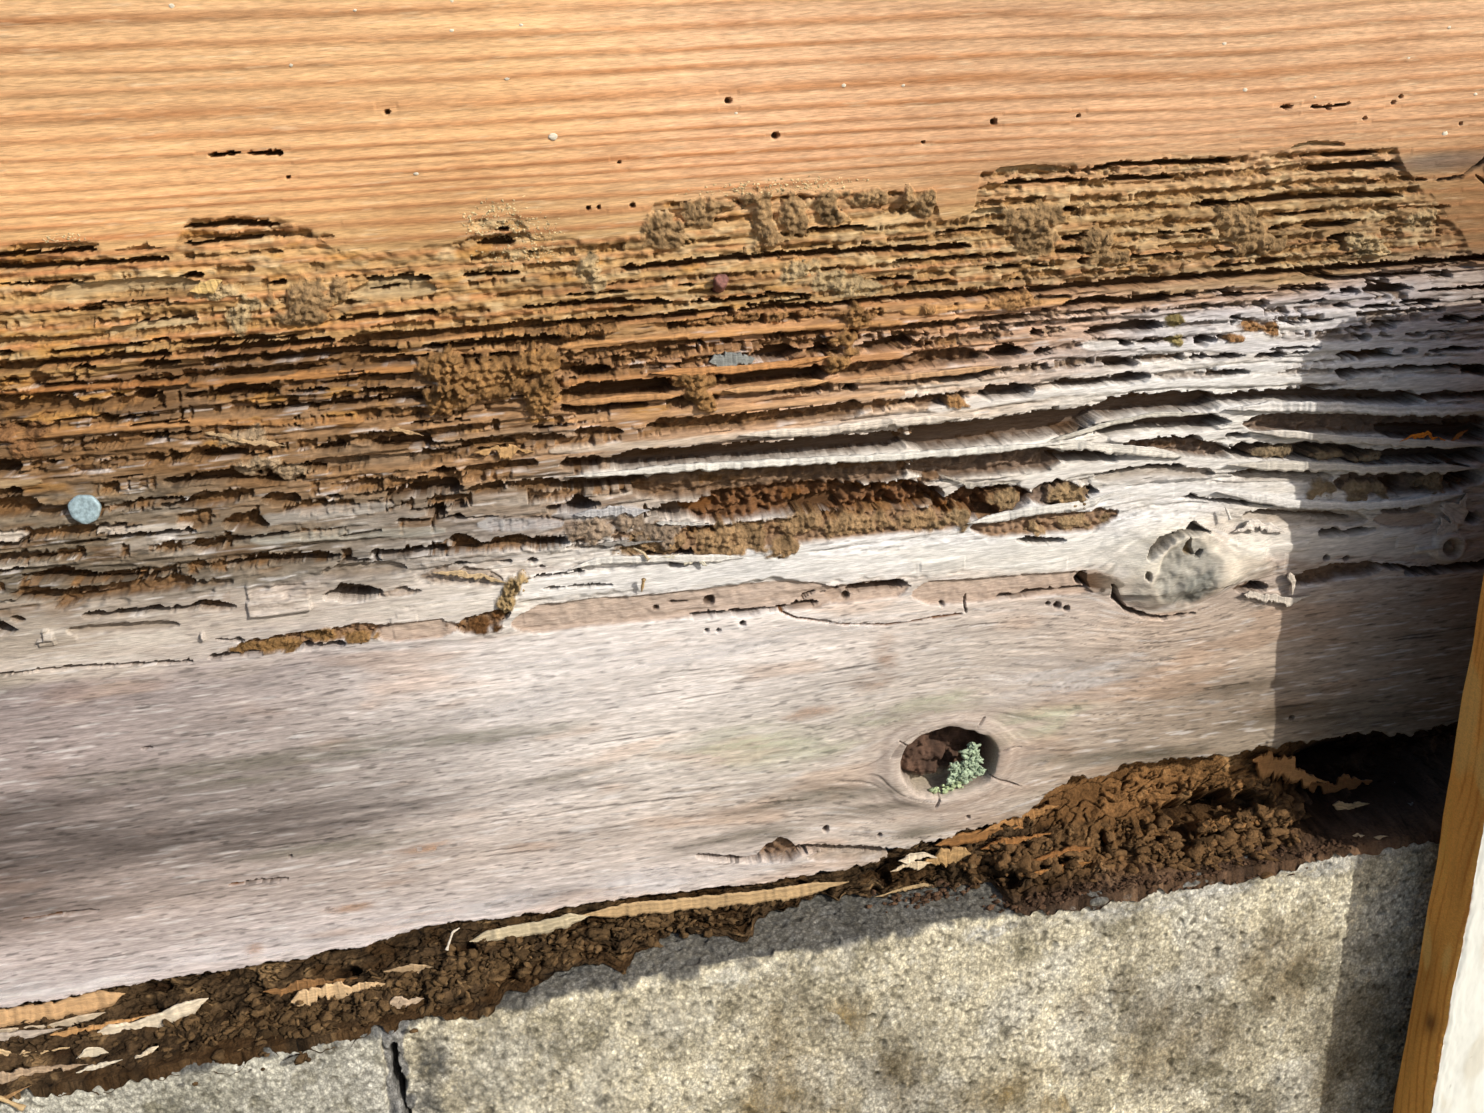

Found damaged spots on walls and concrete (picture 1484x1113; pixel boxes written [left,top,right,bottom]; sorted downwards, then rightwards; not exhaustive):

crack [389,1042,412,1113]